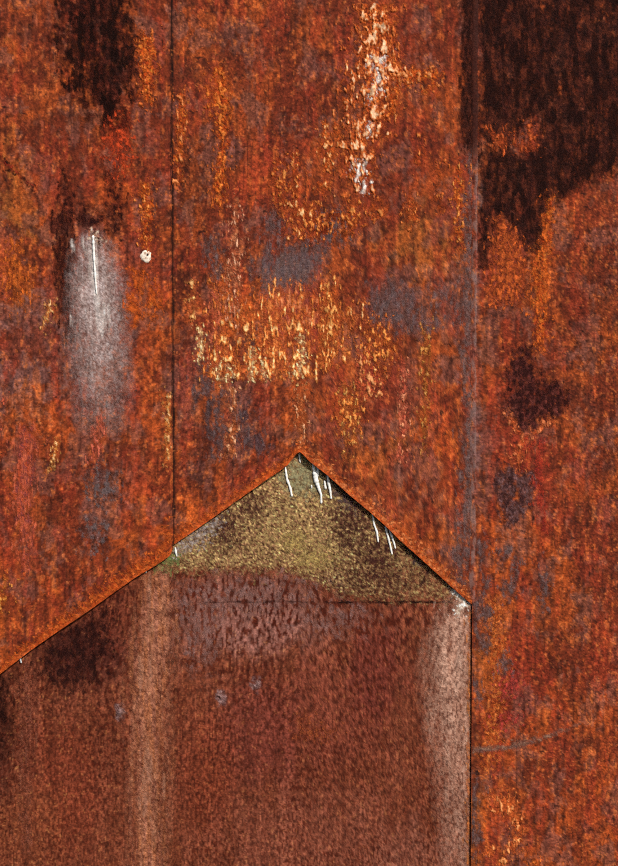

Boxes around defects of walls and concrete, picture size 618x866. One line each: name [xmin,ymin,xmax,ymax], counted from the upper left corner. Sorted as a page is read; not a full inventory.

water stain [49,0,144,136]
rust [130,25,162,111]
rust [272,3,444,247]
rust [484,120,539,156]
water stain [458,0,618,269]
water stain [50,170,129,373]
rust [483,194,562,355]
rust [0,63,525,793]
rust [503,412,555,474]
water stain [500,345,570,433]
rust [466,789,541,866]